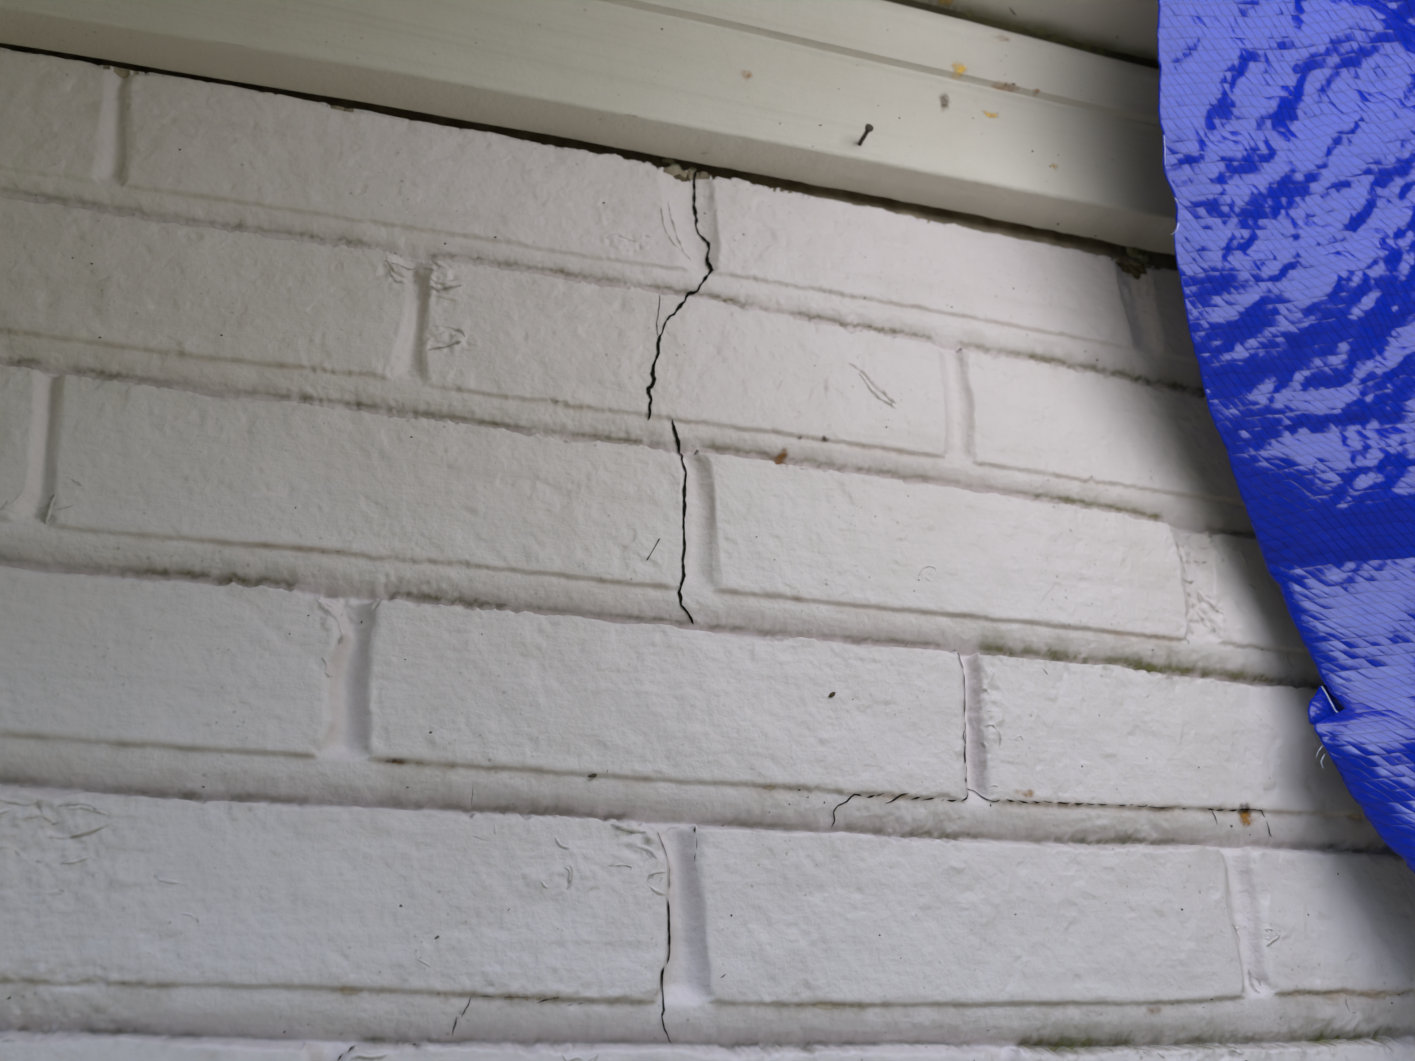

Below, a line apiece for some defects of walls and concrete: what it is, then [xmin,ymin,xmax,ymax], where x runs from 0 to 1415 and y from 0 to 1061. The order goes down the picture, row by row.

crack [646,172,713,624]
crack [832,650,1273,838]
crack [657,826,697,1045]